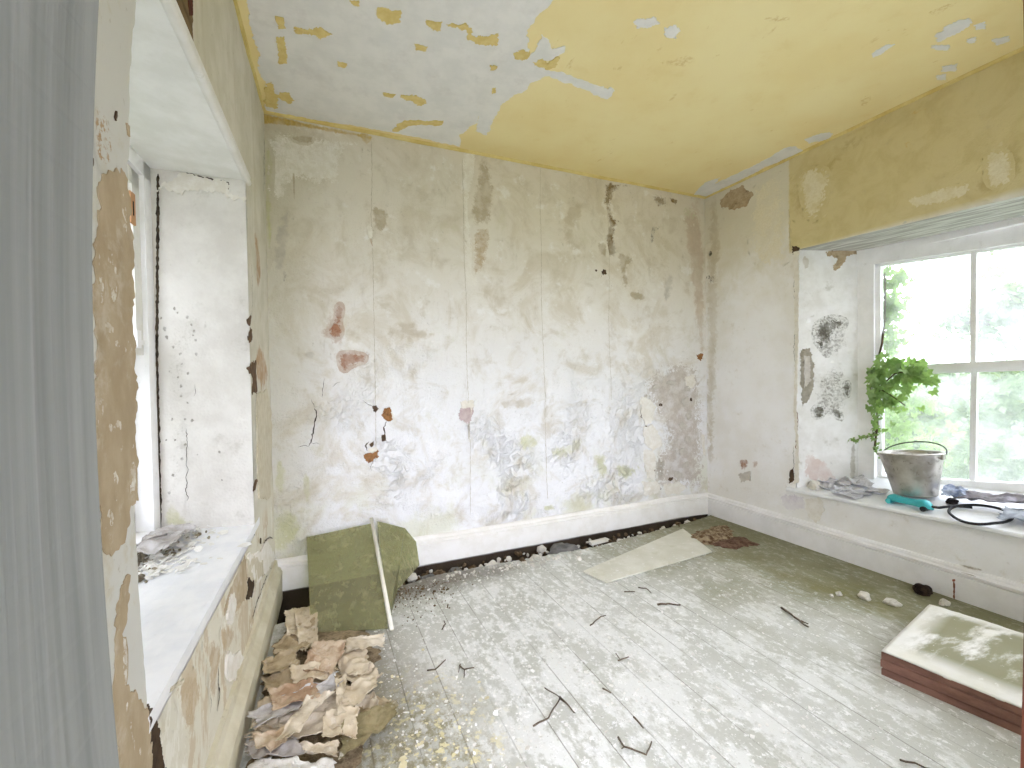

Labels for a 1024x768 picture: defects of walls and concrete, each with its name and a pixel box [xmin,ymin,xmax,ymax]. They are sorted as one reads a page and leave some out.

peeling [247,0,615,147]
peeling [931,18,1010,51]
water stain [559,180,647,303]
peeling [905,146,1015,210]
peeling [92,105,139,556]
crack [300,382,339,447]
rust [317,298,376,377]
water stain [649,191,724,492]
peeling [694,132,890,523]
water stain [804,310,856,425]
peeling [112,525,228,768]
peeling [169,542,252,738]